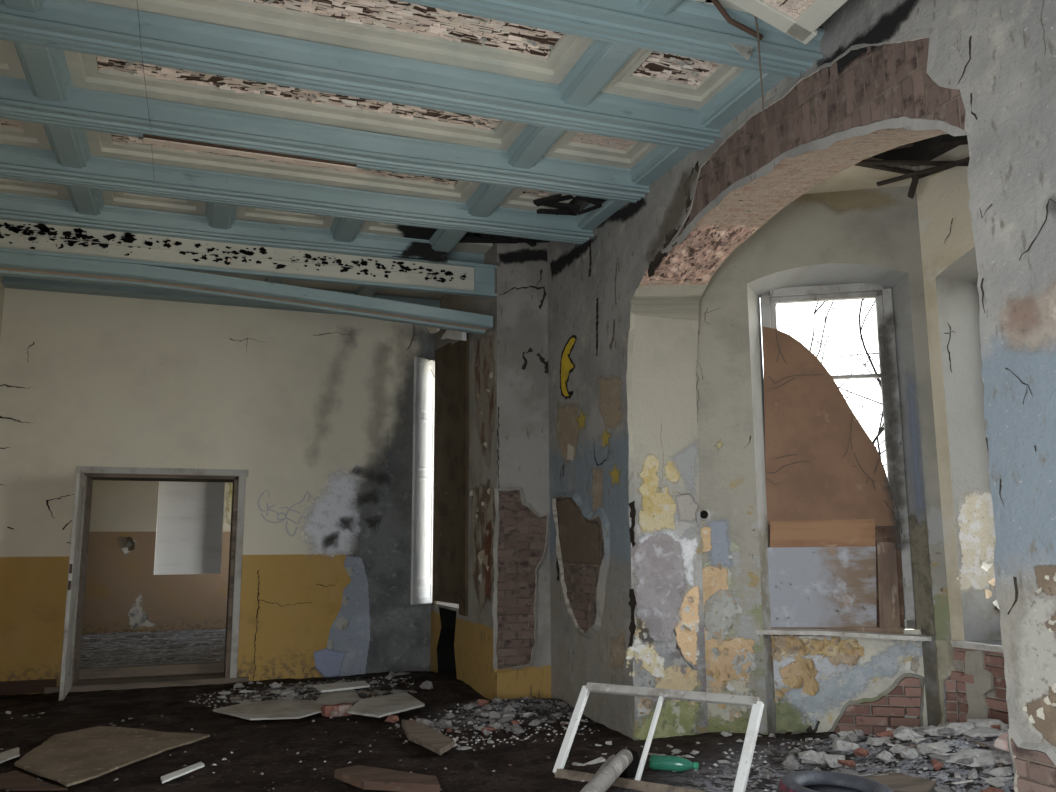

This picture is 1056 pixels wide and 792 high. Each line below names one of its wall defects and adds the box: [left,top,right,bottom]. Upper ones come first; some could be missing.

peeling [239,0,563,58]
flaking render [632,28,975,284]
peeling [0,222,466,283]
crack [1019,199,1056,260]
crack [253,570,335,681]
leakage [304,331,434,674]
flaking render [470,469,610,673]
flaking render [626,508,757,722]
peeling [771,635,865,703]
flaking render [806,673,925,735]
peeling [957,491,1000,610]
peeling [943,565,1056,792]